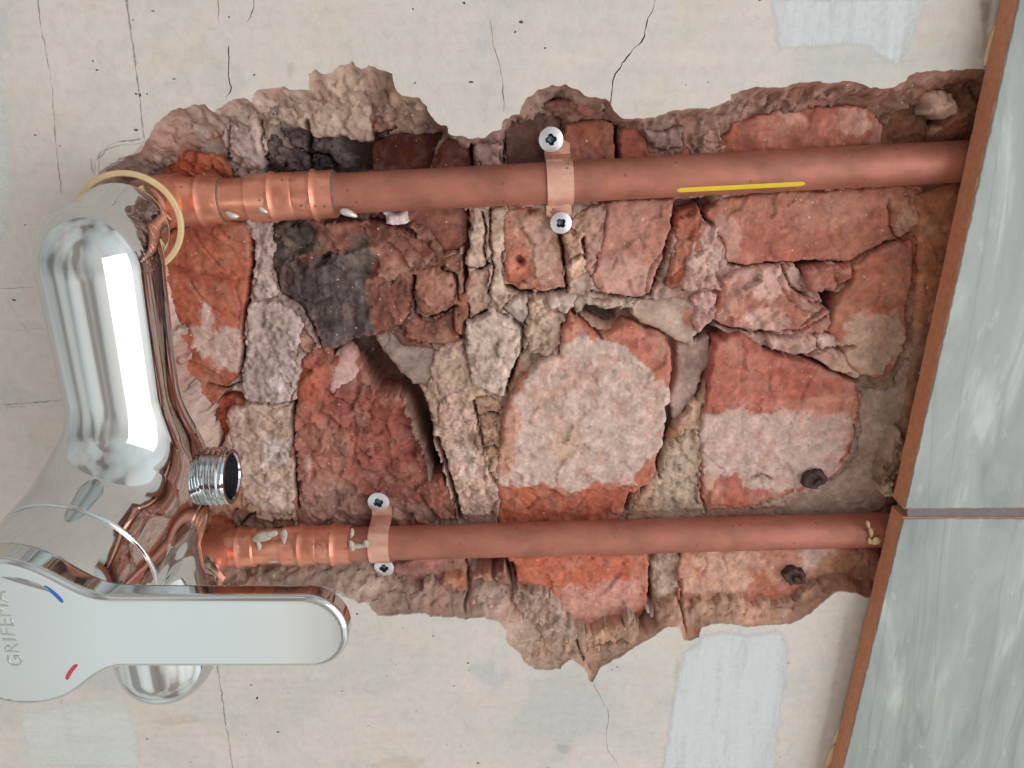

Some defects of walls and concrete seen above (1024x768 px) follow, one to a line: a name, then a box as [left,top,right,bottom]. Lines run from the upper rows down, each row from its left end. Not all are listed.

crack [610,3,655,102]
spalling [101,61,985,185]
spalling [164,183,961,536]
spalling [222,547,882,681]